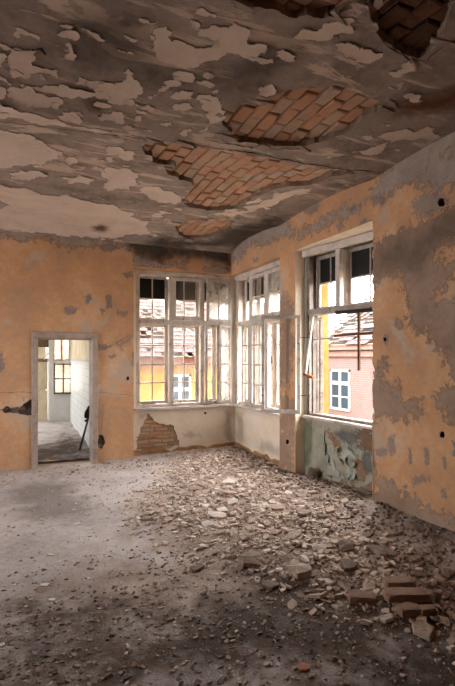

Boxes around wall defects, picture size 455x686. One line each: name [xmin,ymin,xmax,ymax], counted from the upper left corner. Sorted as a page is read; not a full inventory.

flaking render [275,0,455,103]
flaking render [0,0,398,278]
peeling [203,123,455,531]
flaking render [0,399,32,415]
flaking render [136,414,179,450]